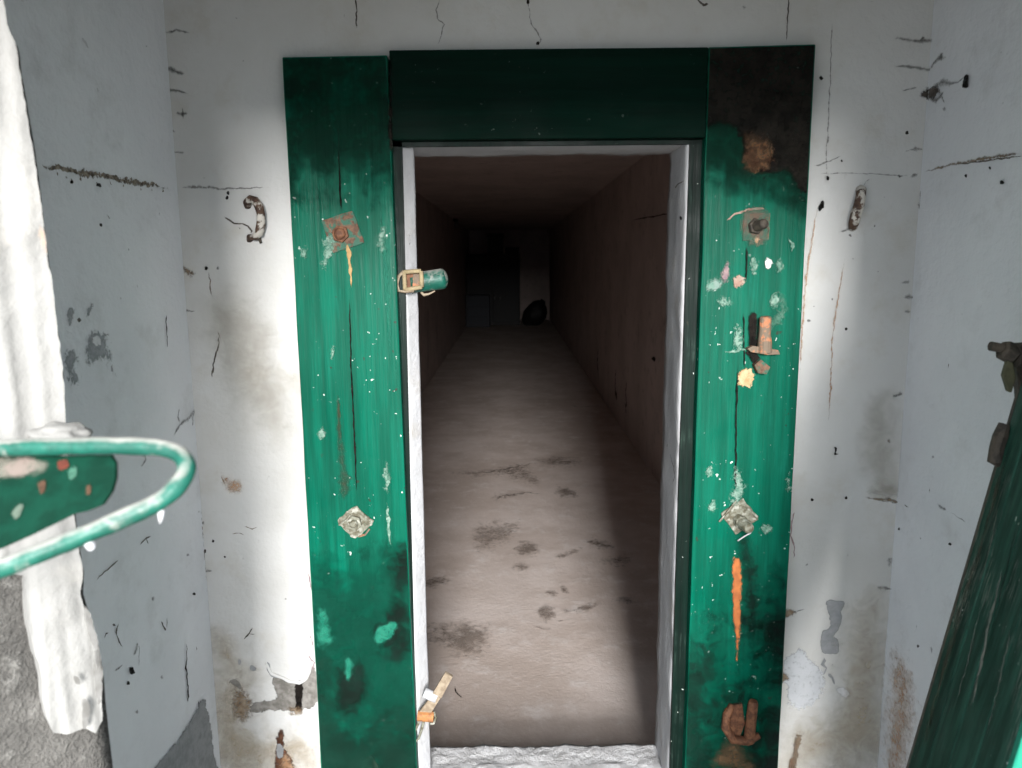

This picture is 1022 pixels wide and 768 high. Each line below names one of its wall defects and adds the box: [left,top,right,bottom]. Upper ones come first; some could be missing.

crack [817,34,1020,184]
crack [42,164,164,192]
rust [743,134,775,174]
water stain [67,304,93,325]
flaking render [238,635,318,715]
peeling [783,600,850,710]
rust [888,658,910,768]